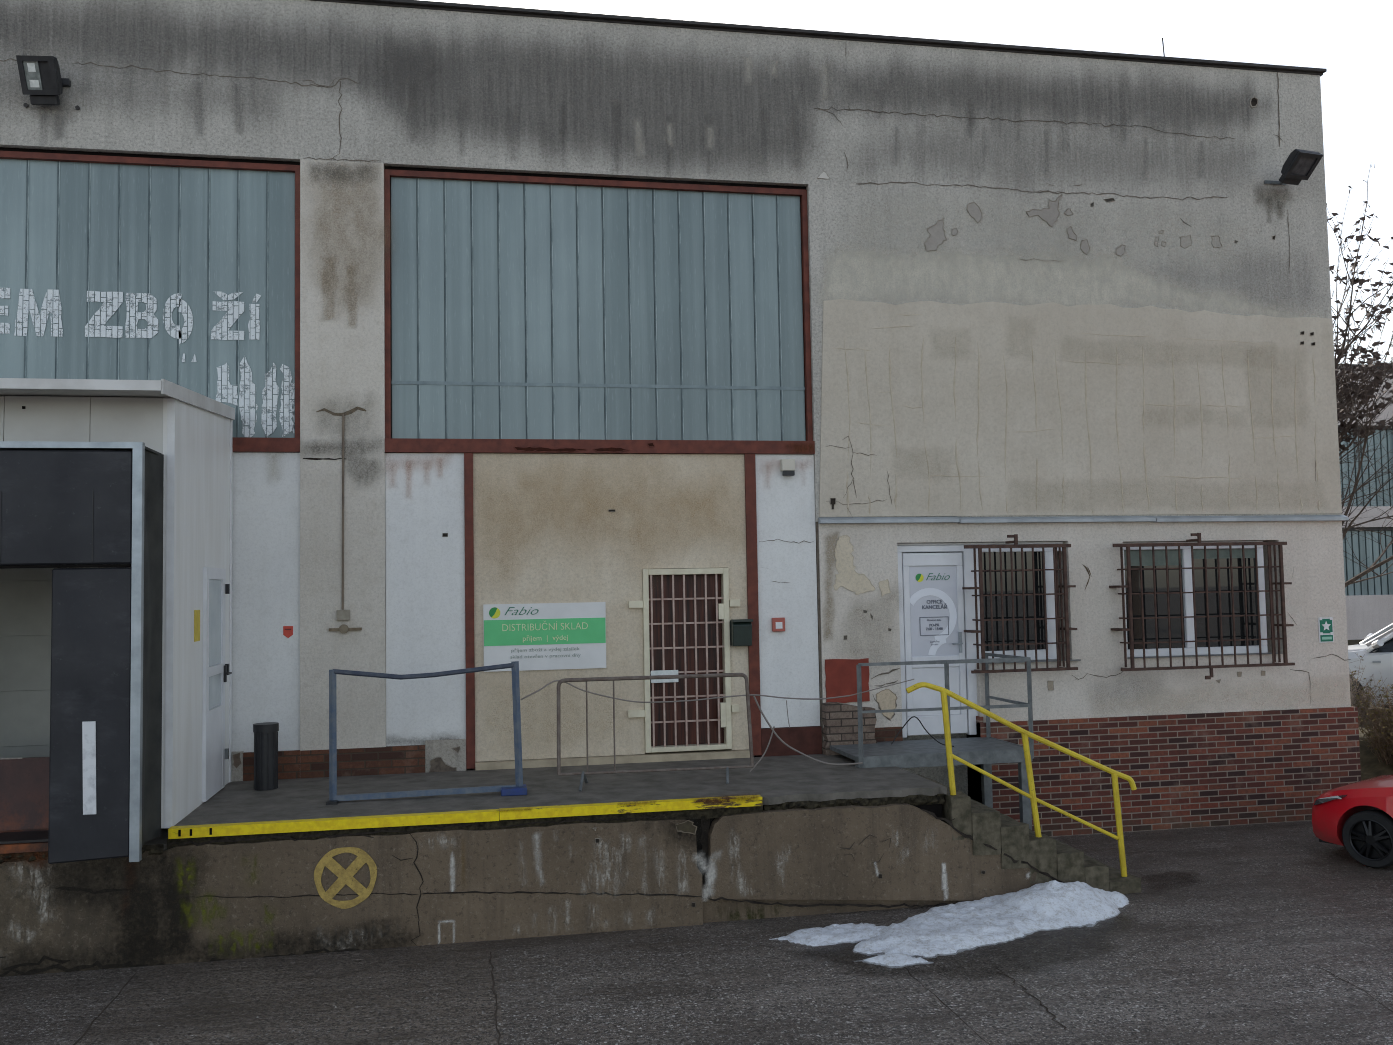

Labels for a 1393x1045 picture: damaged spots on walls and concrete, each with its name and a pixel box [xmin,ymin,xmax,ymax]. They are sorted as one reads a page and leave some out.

water stain [0,7,827,161]
water stain [848,67,1252,126]
crack [814,106,1235,226]
peeling [1026,194,1090,254]
crack [826,436,892,518]
peeling [826,535,891,640]
water stain [1,855,407,977]
crack [168,816,965,946]
water stain [682,856,715,897]
crack [921,809,1064,883]